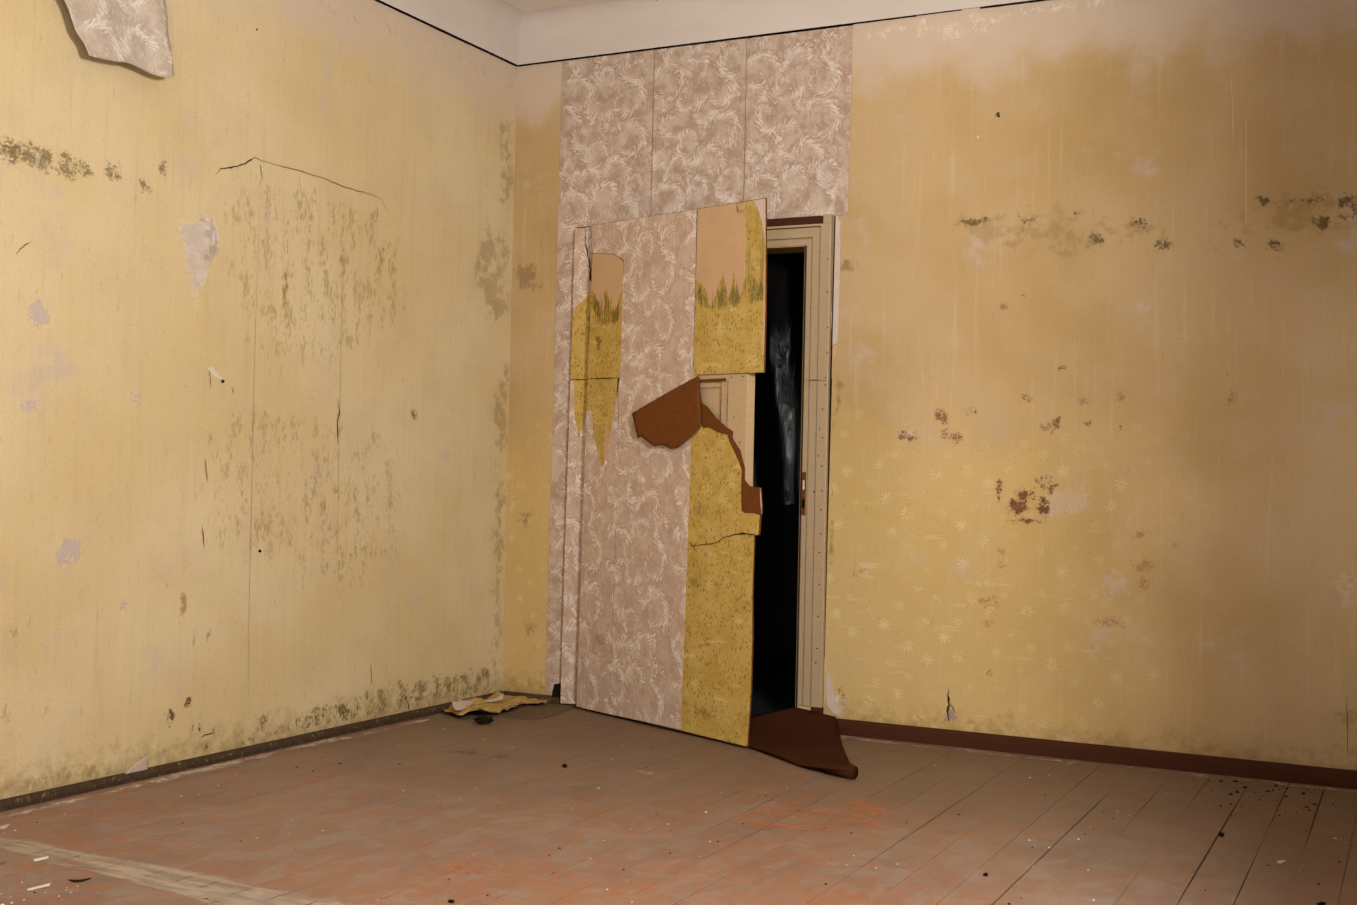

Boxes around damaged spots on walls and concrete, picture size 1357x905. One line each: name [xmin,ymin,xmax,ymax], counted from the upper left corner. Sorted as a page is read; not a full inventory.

water stain [0,137,121,181]
water stain [1290,192,1357,230]
flaking render [181,217,219,297]